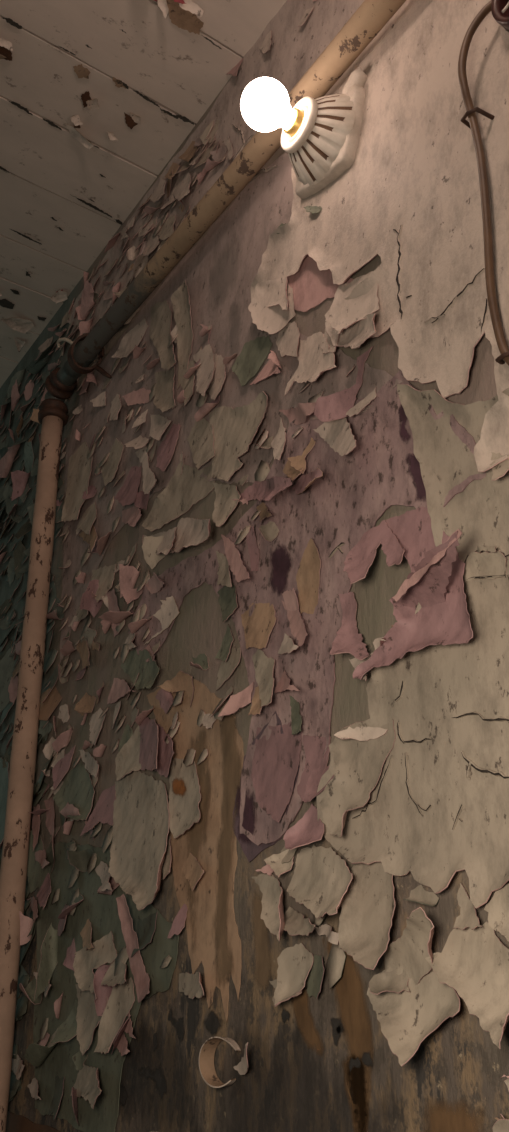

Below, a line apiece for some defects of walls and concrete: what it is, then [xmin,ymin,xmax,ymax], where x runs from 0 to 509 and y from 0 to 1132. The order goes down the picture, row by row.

peeling [0,38,14,61]
peeling [9,46,118,149]
peeling [154,0,222,49]
crack [393,224,489,331]
flaking render [0,77,403,1126]
peeling [330,507,507,681]
crack [464,548,509,582]
crack [352,681,463,830]
crack [451,711,509,723]
crack [461,751,509,779]
peeling [197,603,509,1067]
peeling [492,1113,509,1132]